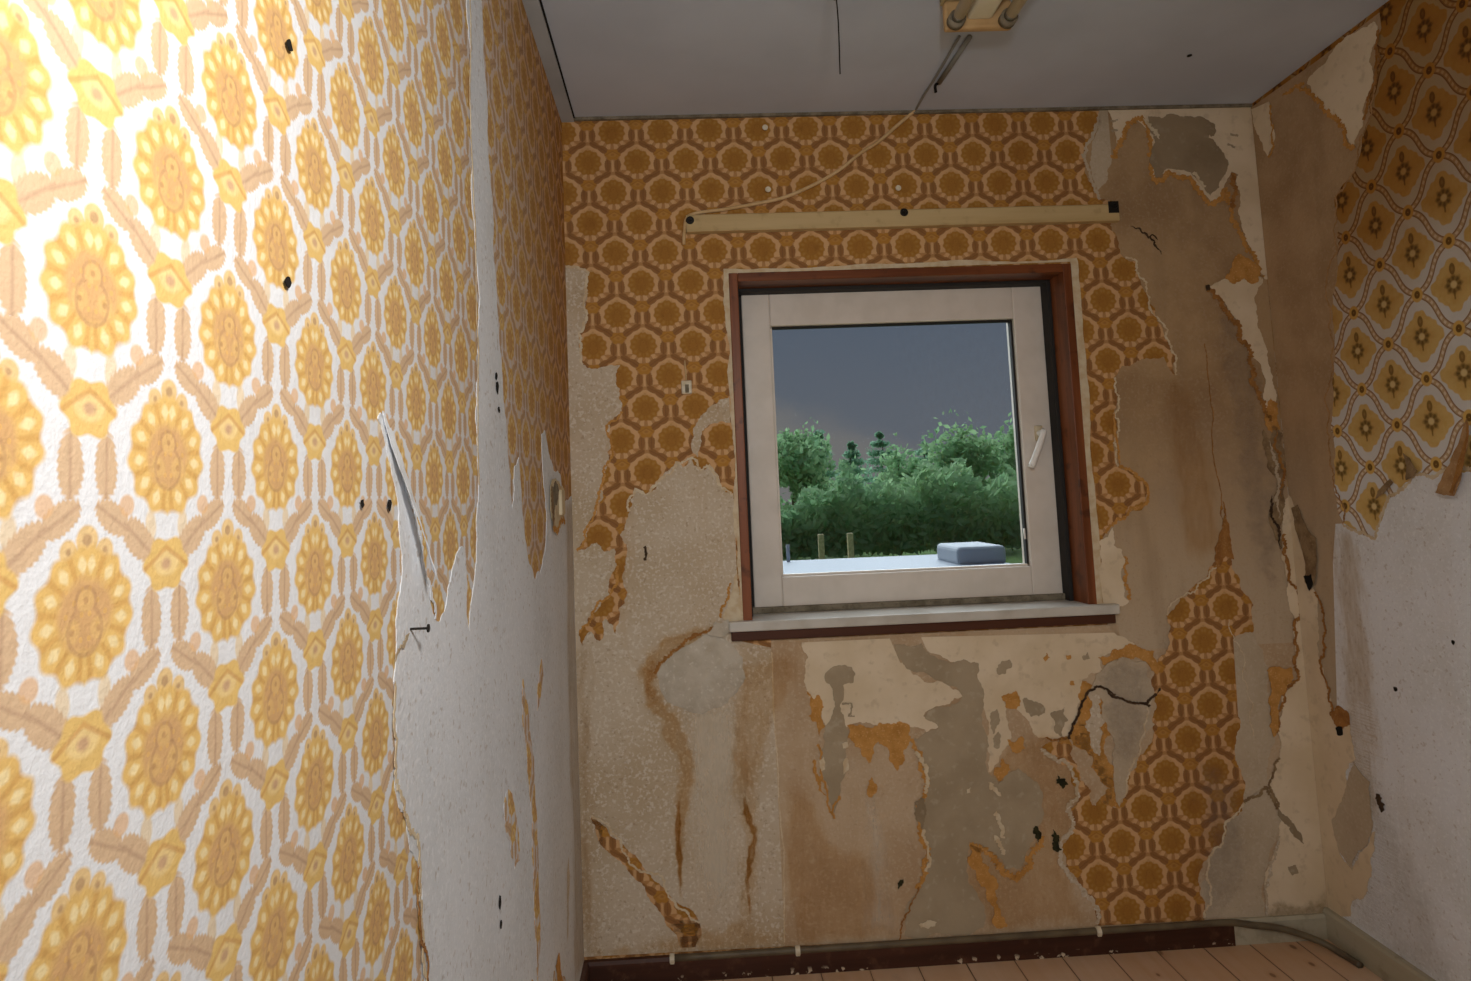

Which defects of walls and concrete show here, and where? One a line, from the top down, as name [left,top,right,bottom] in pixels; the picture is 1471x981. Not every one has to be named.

peeling [1090,110,1118,190]
flaking render [1148,114,1238,195]
peeling [1225,254,1261,284]
flaking render [719,258,1131,621]
peeling [1214,502,1234,570]
peeling [1043,652,1155,807]
crack [1045,685,1161,742]
peeling [1228,620,1294,799]
peeling [1330,705,1350,729]
flaking render [806,643,1068,940]